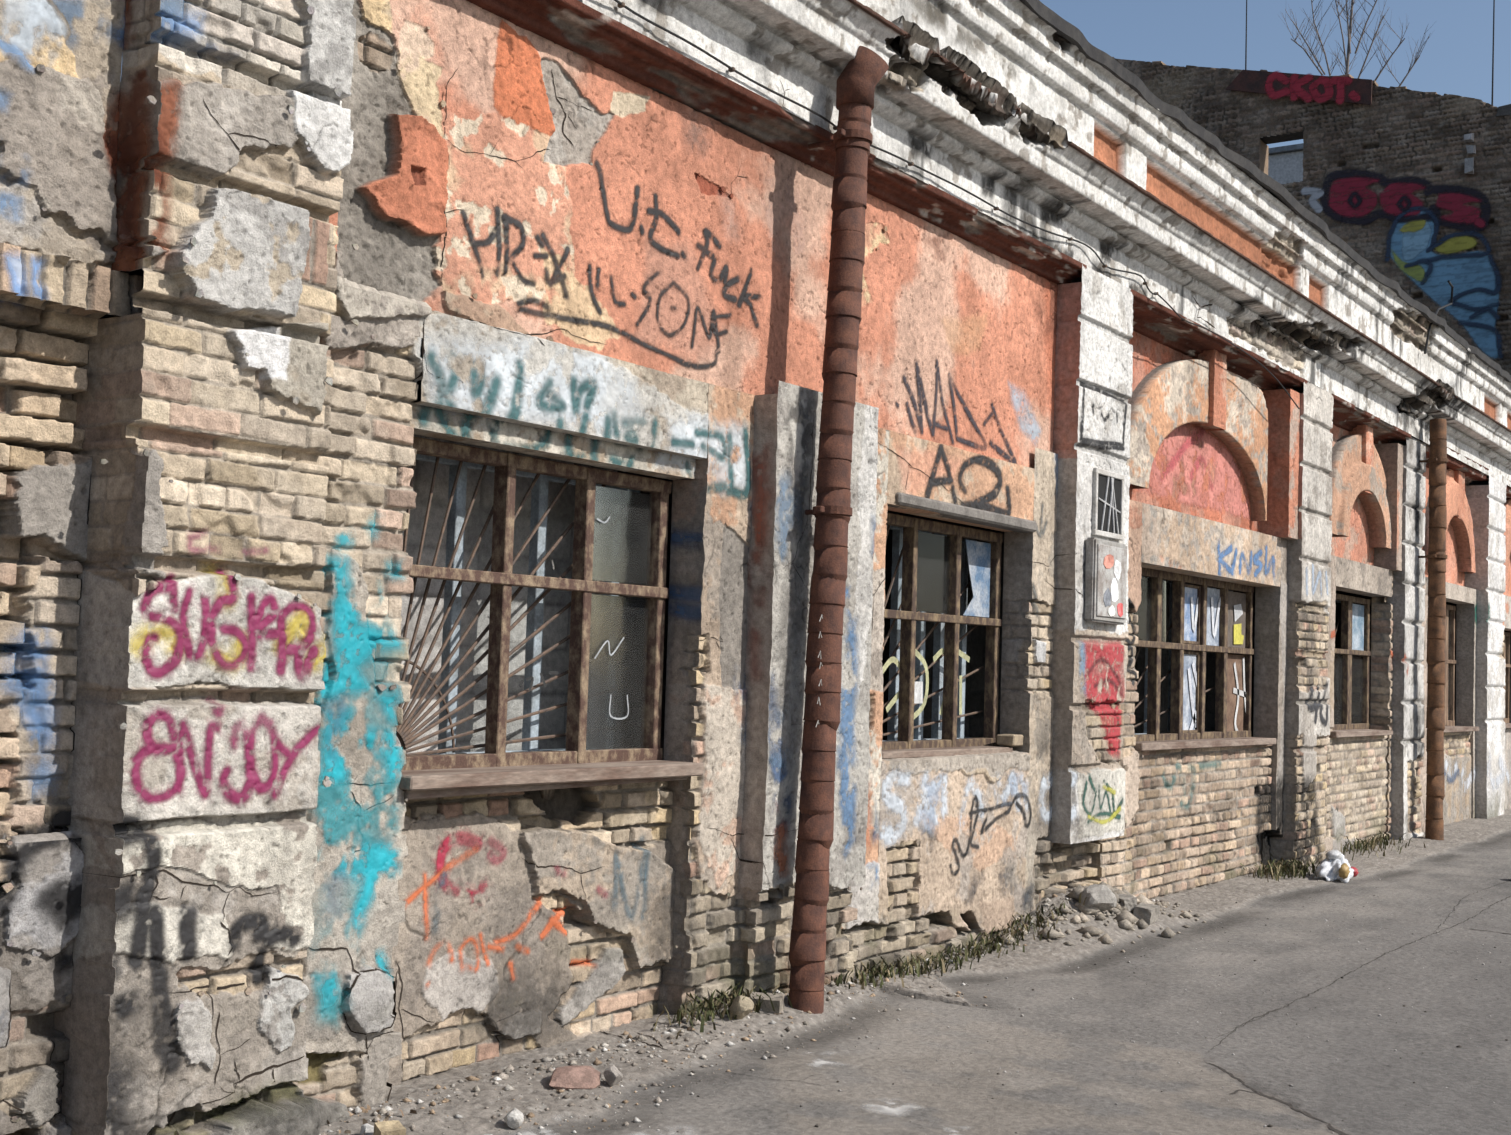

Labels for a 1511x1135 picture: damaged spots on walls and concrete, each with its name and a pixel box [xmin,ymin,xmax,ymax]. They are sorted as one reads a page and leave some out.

peeling [0,54,120,244]
corrosion [103,70,180,271]
spalling [146,0,554,341]
spalling [541,57,615,166]
spalling [885,15,1073,149]
peeling [231,322,333,412]
crack [88,869,431,1135]
peeling [404,781,739,1034]
spalling [757,879,795,902]
spalling [886,839,980,934]
crack [1206,880,1510,1135]